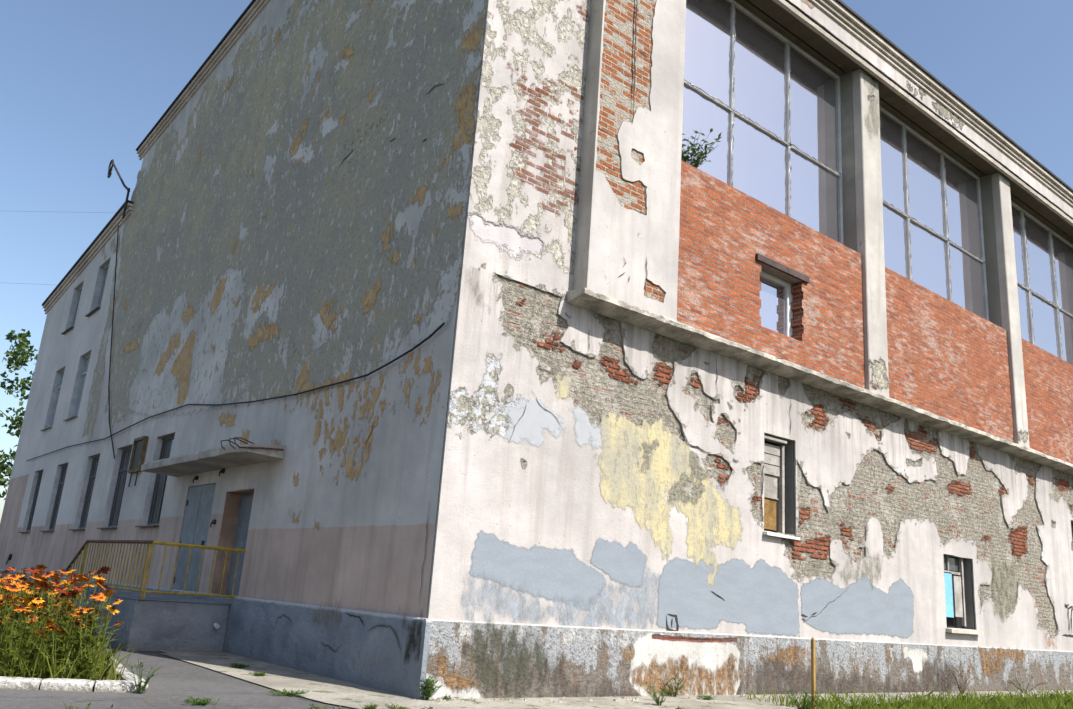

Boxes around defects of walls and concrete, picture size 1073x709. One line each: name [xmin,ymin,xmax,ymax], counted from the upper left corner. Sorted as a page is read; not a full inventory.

peeling [82,0,792,586]
flaking render [867,359,889,392]
flaking render [777,383,1073,639]
leakage [464,625,578,698]
leakage [736,655,956,695]